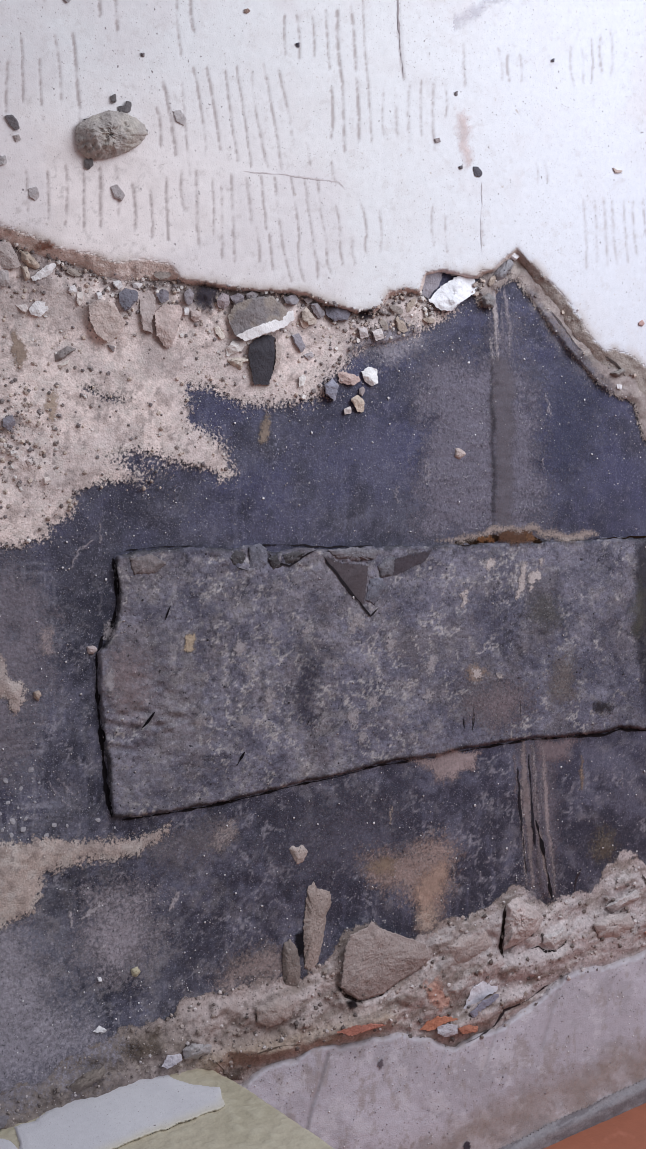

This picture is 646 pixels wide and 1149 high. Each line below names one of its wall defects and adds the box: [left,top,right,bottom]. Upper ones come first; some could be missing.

spalling [0,226,646,570]
peeling [328,547,395,606]
peeling [515,558,545,599]
peeling [87,622,115,654]
peeling [0,564,61,785]
crack [95,544,434,820]
peeling [348,694,381,743]
crack [460,705,646,752]
peeling [289,845,308,865]
flaking render [0,872,225,1149]
spalling [437,1023,458,1037]
spalling [463,980,498,1009]